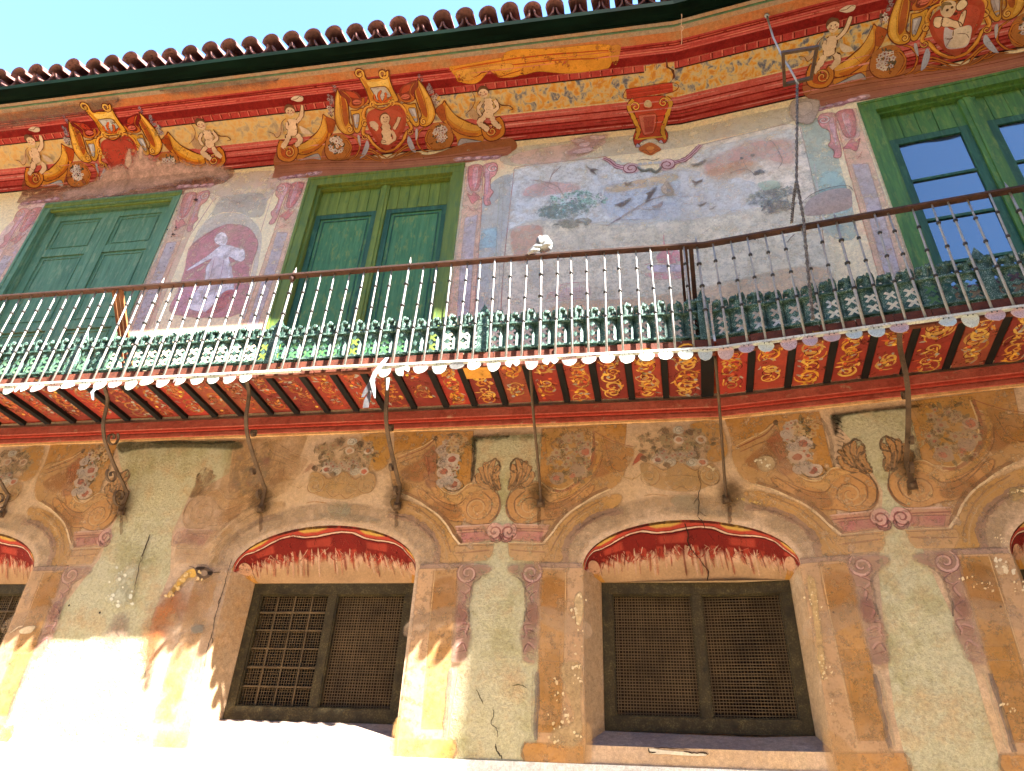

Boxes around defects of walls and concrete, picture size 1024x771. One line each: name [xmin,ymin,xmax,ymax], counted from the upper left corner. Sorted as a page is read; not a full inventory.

peeling [62,146,229,198]
crack [685,470,709,581]
crack [204,561,232,667]
crack [476,684,526,759]